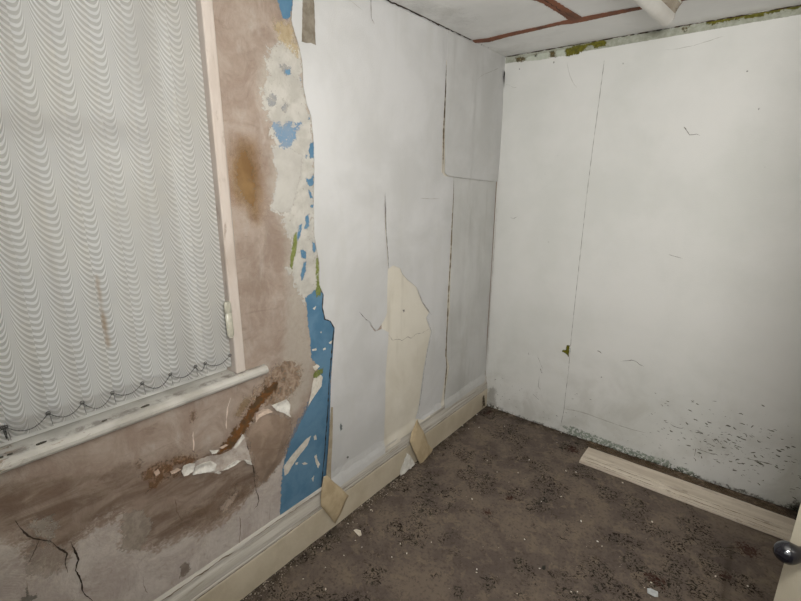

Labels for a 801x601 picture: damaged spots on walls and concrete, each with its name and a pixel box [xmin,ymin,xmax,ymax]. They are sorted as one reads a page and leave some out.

leakage [228,138,263,222]
peeling [251,0,335,515]
flaking render [170,434,252,476]
mould [487,390,801,512]
leakage [178,482,250,528]
crack [16,522,92,601]